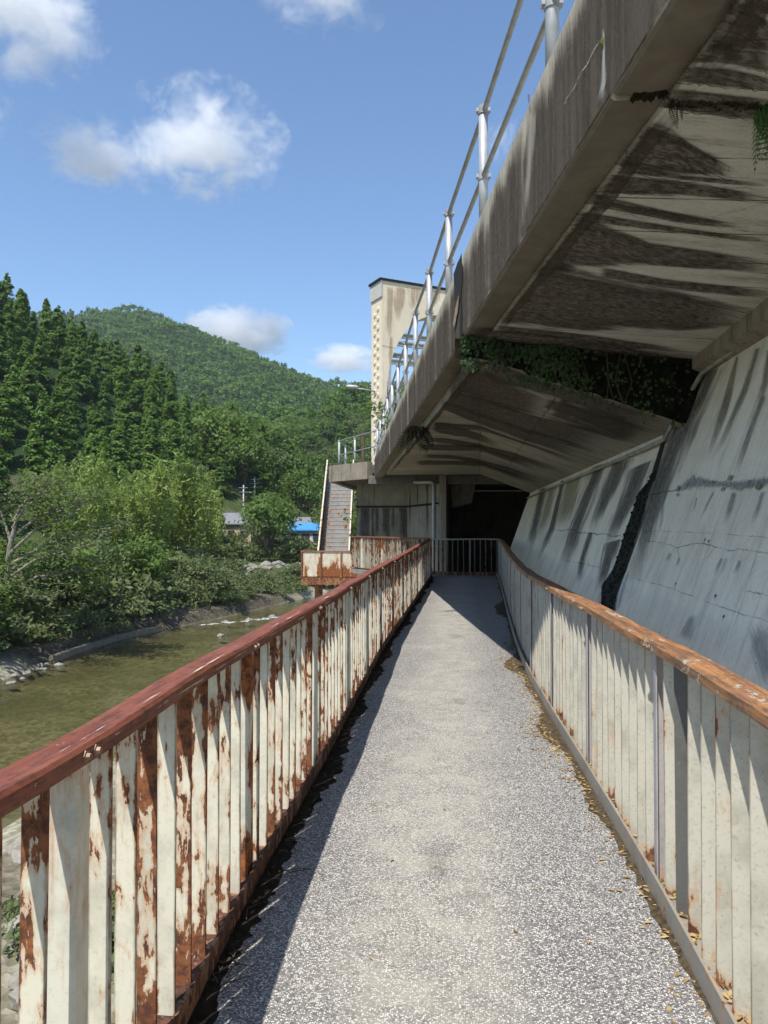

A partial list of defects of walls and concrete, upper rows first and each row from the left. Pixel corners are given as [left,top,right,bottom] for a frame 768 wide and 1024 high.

leakage [374,0,768,479]
leakage [530,481,563,542]
leakage [565,371,716,603]